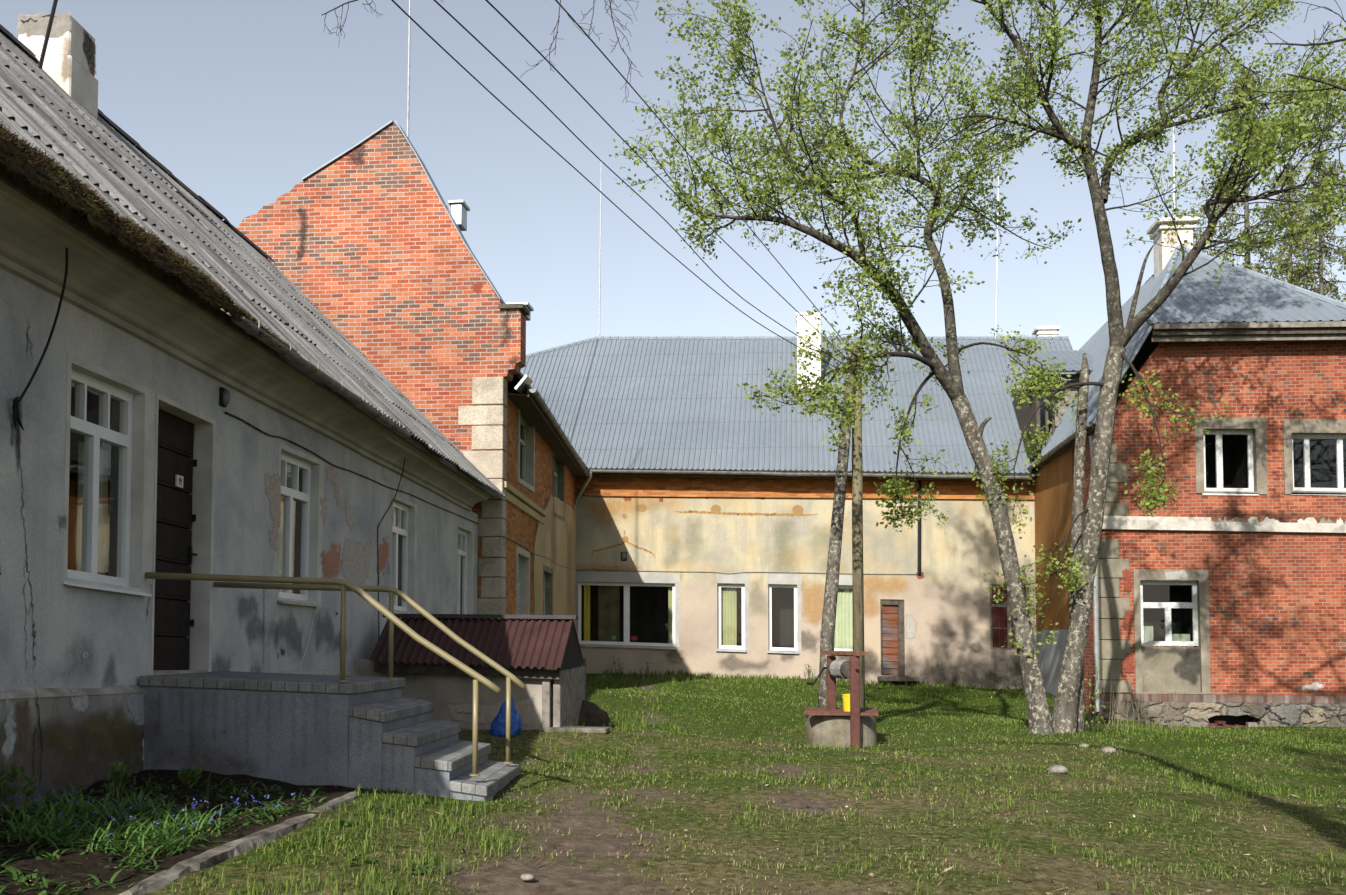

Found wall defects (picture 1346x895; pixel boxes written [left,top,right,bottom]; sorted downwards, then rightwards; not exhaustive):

crack [0,432,44,785]
peeling [2,699,16,757]
water stain [0,724,144,805]